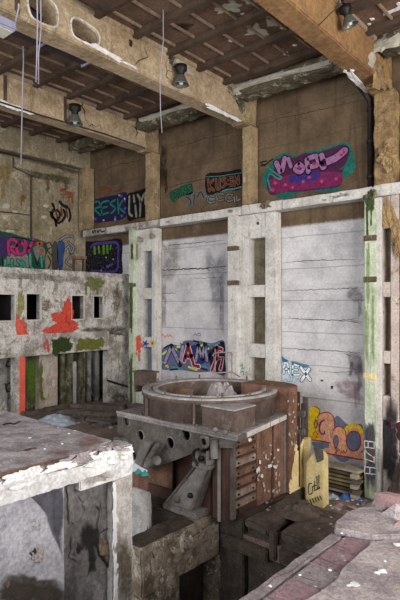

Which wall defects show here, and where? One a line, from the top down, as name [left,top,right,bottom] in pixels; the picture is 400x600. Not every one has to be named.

peeling [214,0,259,15]
peeling [245,16,284,37]
peeling [343,33,400,95]
spalling [375,142,399,174]
crack [285,317,364,325]
leakage [52,338,82,357]
peeling [2,446,135,491]
leakage [76,524,98,572]